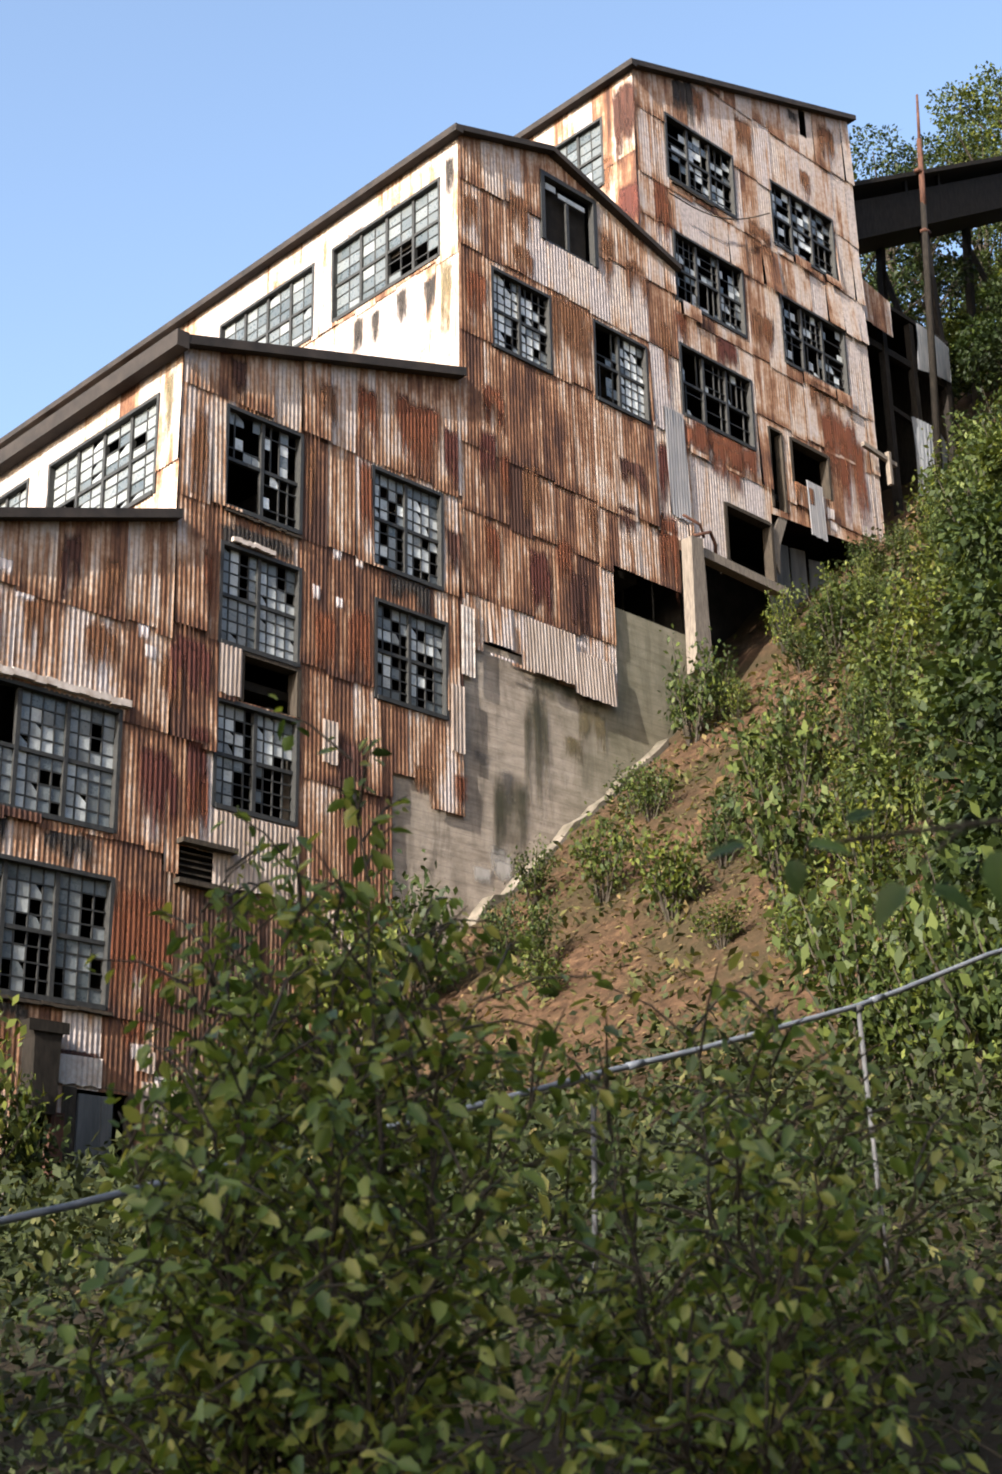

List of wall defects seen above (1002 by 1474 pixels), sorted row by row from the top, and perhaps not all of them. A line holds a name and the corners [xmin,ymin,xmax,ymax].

corrosion [603,82,669,238]
corrosion [734,115,752,149]
corrosion [799,169,811,196]
corrosion [509,190,533,279]
corrosion [358,387,378,438]
corrosion [396,392,459,489]
corrosion [359,460,373,539]
corrosion [26,532,81,648]
corrosion [85,558,122,662]
corrosion [161,633,211,705]
corrosion [139,727,210,841]
leakage [494,678,602,831]